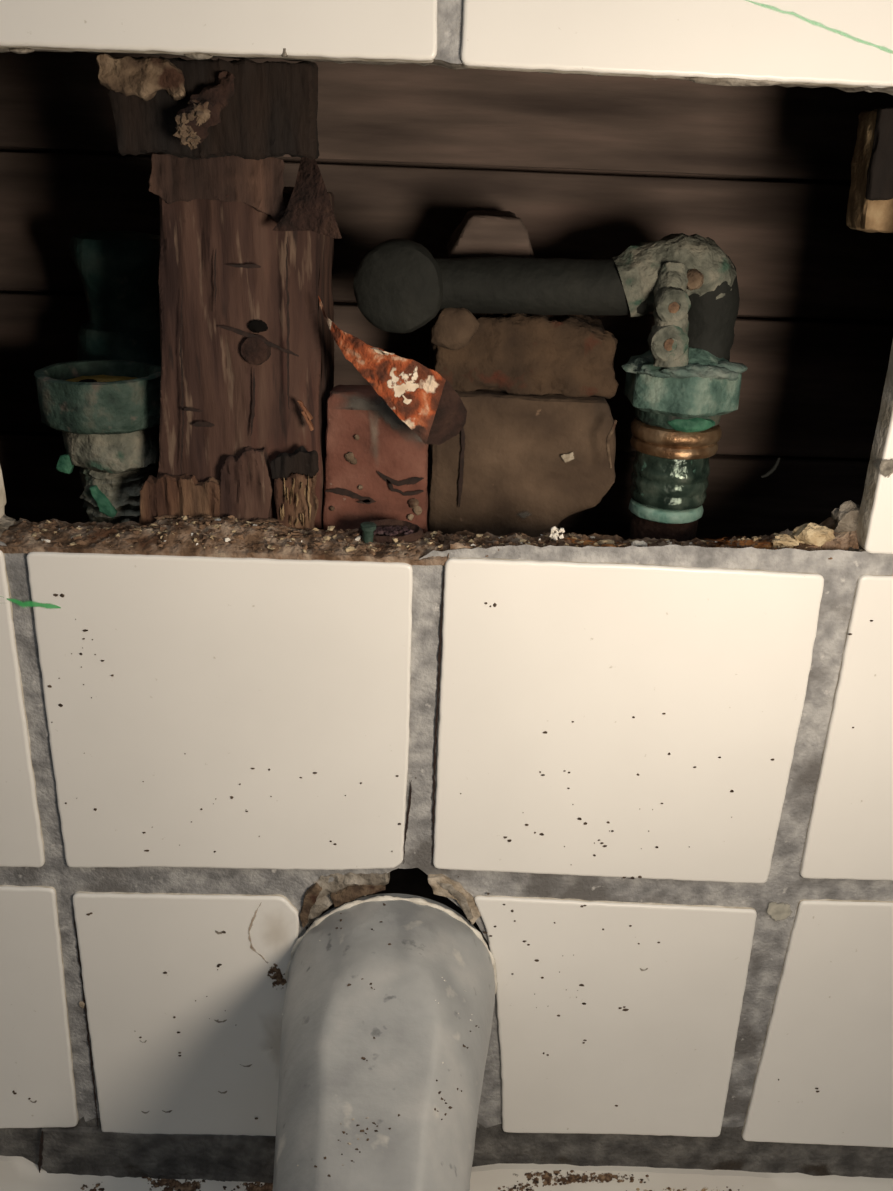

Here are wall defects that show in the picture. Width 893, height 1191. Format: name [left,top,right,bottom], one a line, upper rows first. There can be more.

peeling [56,454,74,474]
spalling [880,459,893,478]
spalling [0,485,859,566]
peeling [299,882,386,928]